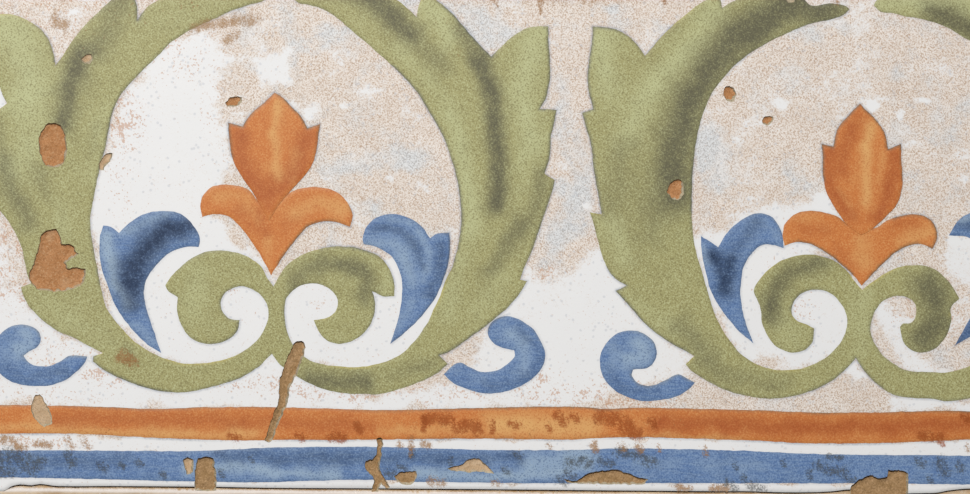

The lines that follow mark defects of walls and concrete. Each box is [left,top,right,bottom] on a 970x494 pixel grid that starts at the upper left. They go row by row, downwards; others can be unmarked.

peeling [39,123,67,167]
peeling [29,229,86,292]
crack [265,341,306,443]
peeling [31,394,52,427]
peeling [183,456,217,491]
crack [365,437,390,492]
peeling [447,458,494,474]
peeling [564,469,648,485]
peeling [850,470,909,494]